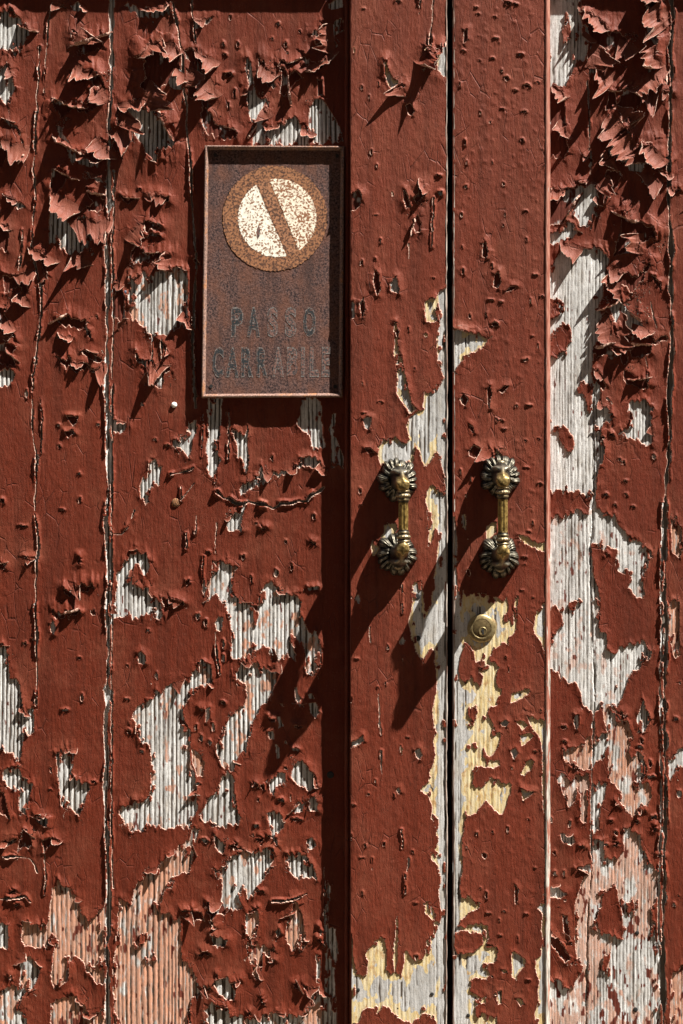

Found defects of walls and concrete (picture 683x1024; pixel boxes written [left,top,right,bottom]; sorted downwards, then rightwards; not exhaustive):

peeling [0,0,355,406]
peeling [0,397,369,1024]
peeling [351,0,683,1024]